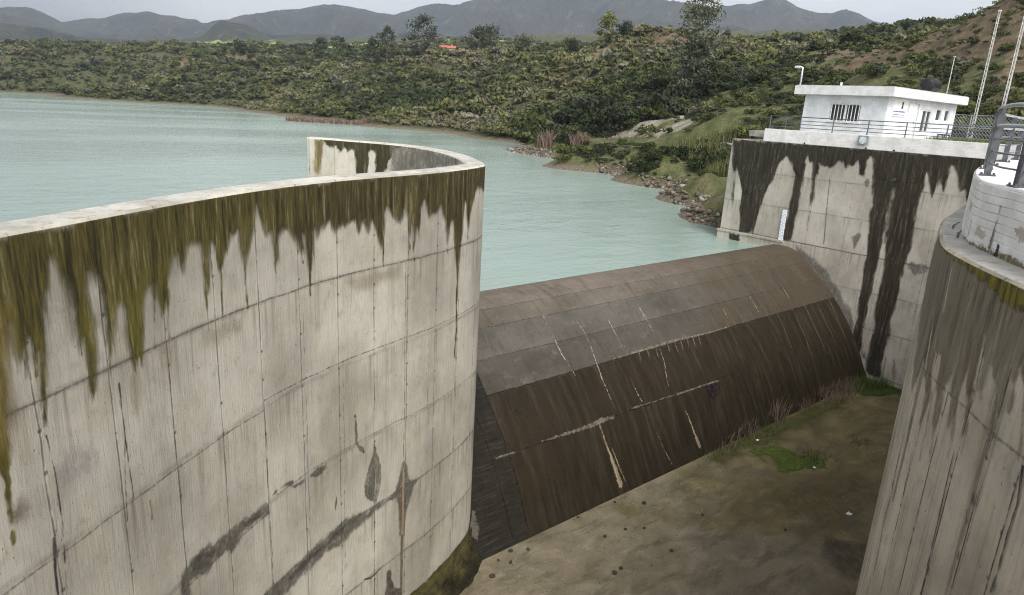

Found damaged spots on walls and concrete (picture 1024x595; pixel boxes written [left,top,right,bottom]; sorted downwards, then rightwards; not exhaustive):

leakage [0,139,485,423]
leakage [729,139,1024,454]
leakage [0,435,22,545]
leakage [265,415,417,595]